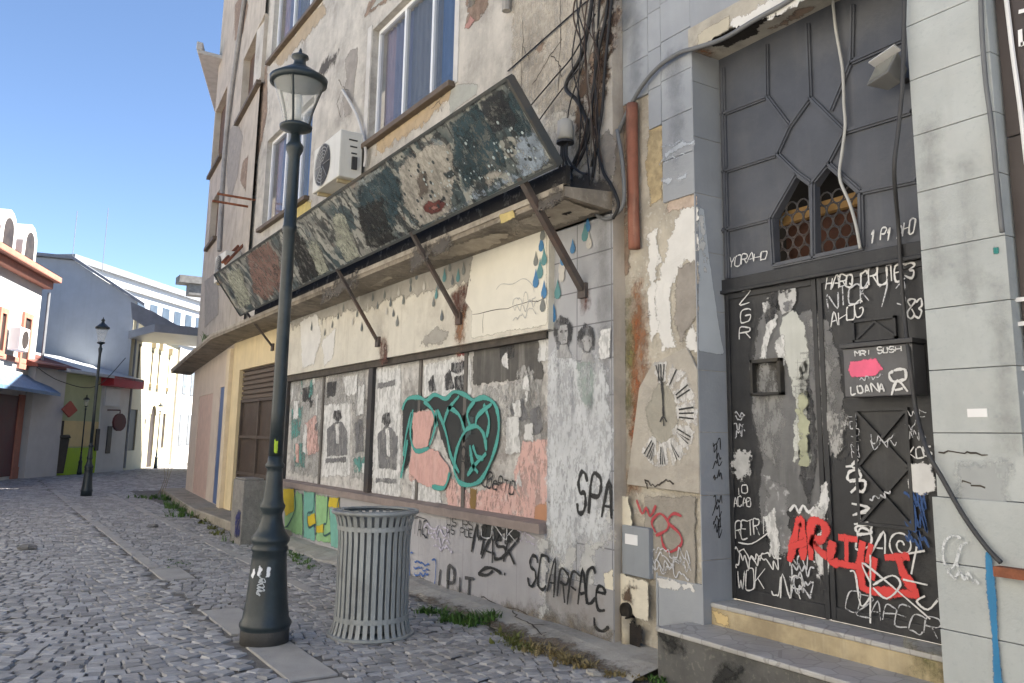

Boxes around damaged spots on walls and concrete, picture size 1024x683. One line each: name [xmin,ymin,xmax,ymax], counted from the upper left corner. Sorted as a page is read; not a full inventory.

flaking render [342,48,358,117]
flaking render [465,0,489,29]
peeling [698,0,814,47]
peeling [645,126,724,355]
corrosion [627,282,649,439]
flaking render [604,496,696,647]